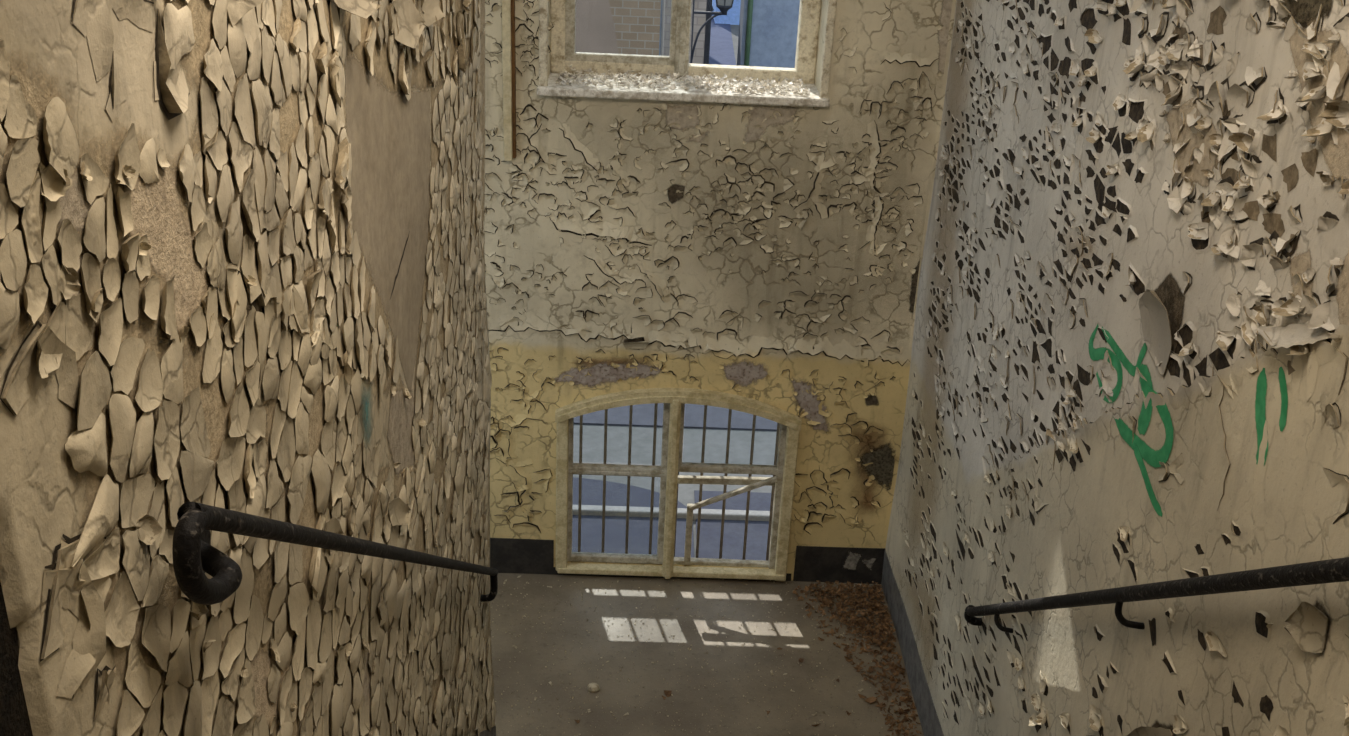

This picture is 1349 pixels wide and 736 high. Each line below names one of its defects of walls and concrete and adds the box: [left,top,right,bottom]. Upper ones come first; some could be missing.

peeling [0,0,932,736]
crack [494,394,549,523]
crack [1008,324,1349,533]